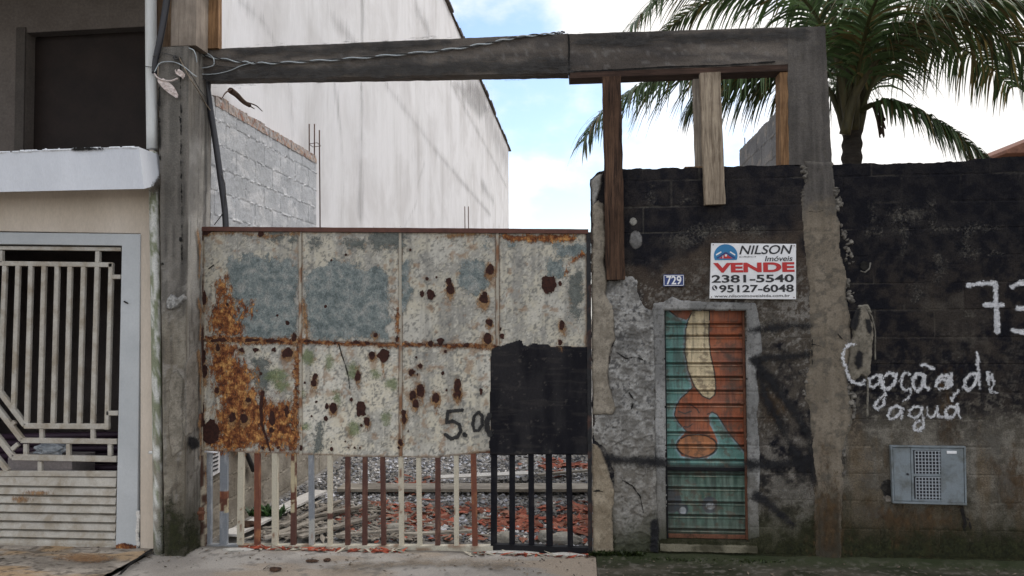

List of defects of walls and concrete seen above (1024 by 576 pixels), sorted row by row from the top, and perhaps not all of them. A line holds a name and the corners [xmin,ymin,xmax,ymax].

rust [445,233,585,294]
rust [558,320,567,350]
rust [197,262,504,488]